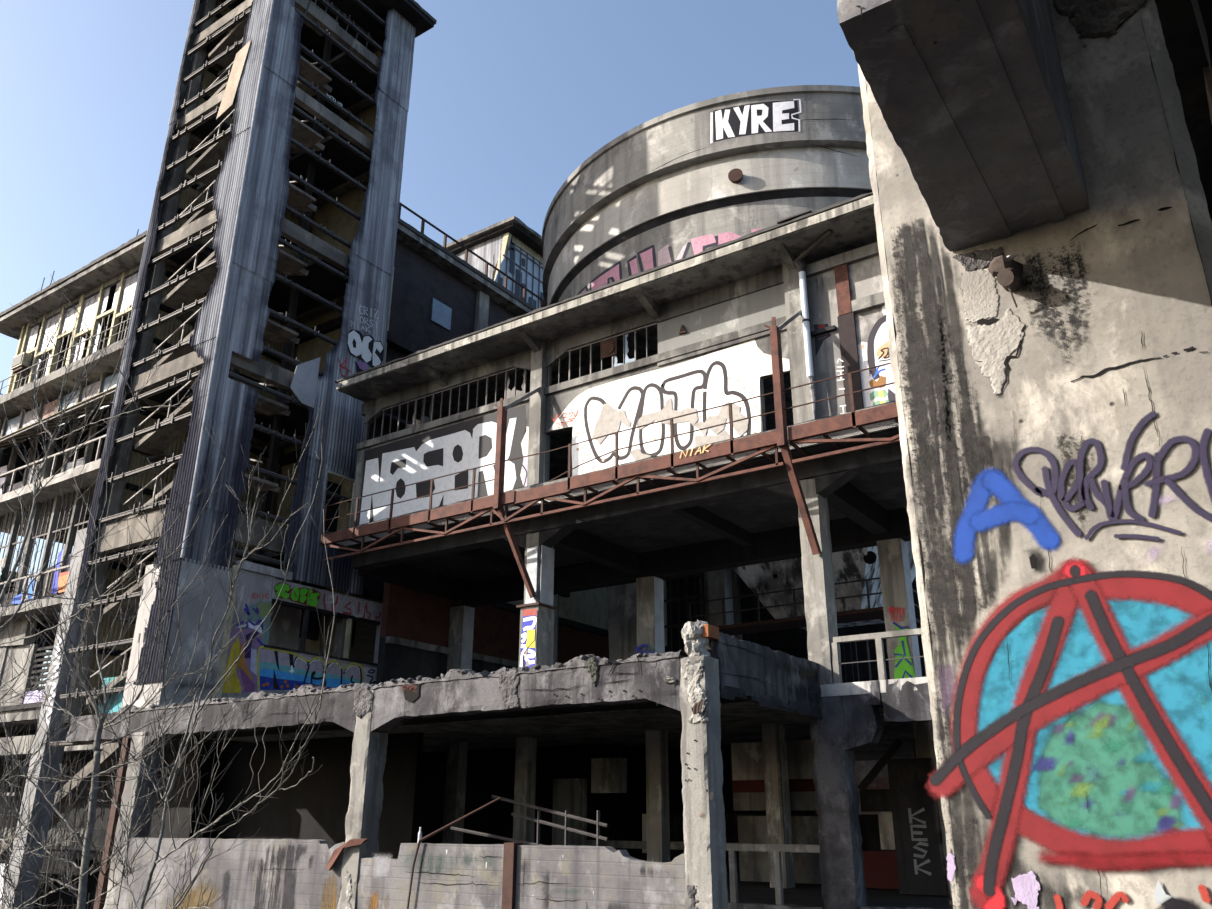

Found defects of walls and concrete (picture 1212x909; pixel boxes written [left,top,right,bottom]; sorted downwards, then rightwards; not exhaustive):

spalling [1053,0,1149,40]
spalling [953,247,1026,396]
water stain [1019,245,1089,364]
crack [1071,331,1208,445]
water stain [892,219,1016,768]
spalling [664,659,709,724]
water stain [251,845,312,909]
water stain [941,782,988,909]
water stain [1000,854,1082,909]